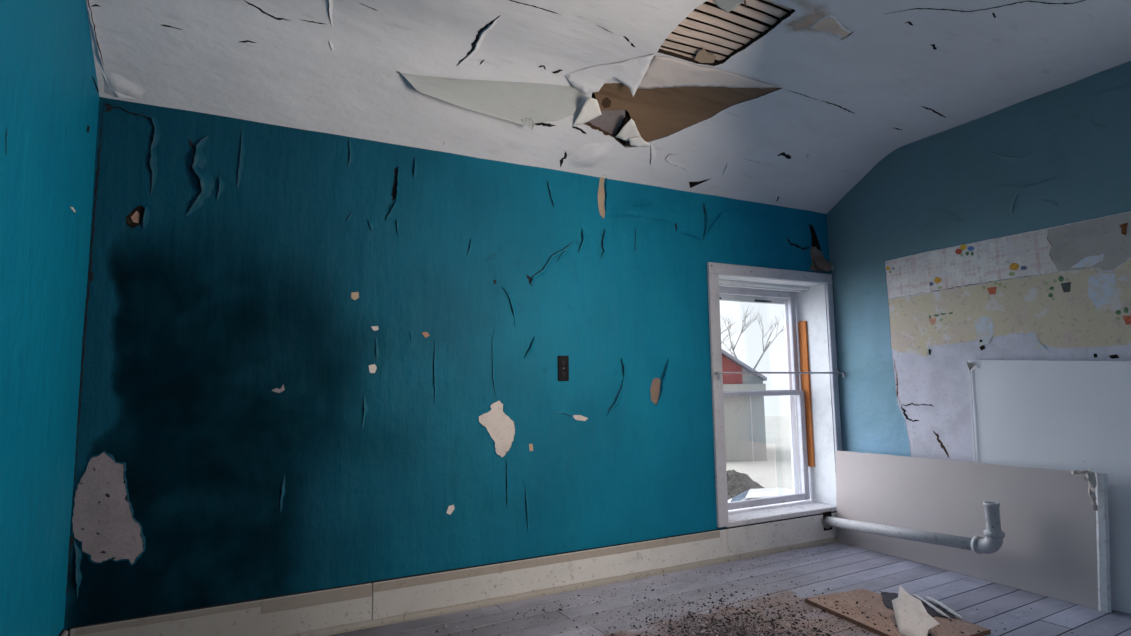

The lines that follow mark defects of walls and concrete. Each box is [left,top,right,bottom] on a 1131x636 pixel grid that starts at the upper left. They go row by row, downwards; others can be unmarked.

crack [233,0,324,24]
crack [456,0,560,67]
crack [887,0,1085,50]
spalling [565,0,792,147]
crack [789,90,853,113]
spalling [126,205,150,228]
peeling [478,325,516,508]
peeling [650,358,669,406]
crack [894,361,949,458]
peeling [71,450,146,598]